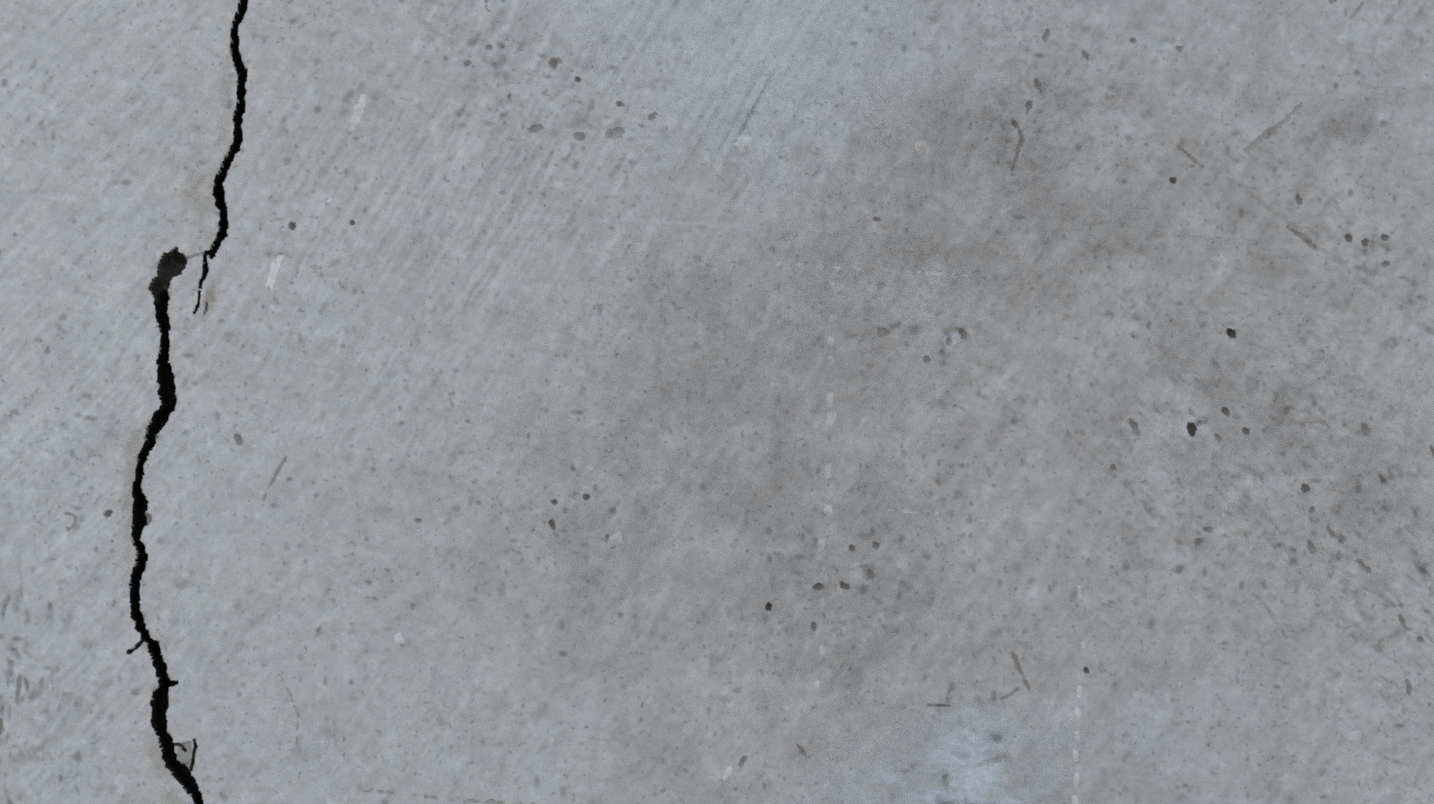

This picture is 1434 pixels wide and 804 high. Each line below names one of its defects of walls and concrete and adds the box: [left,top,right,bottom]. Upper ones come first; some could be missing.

crack [126,0,248,804]